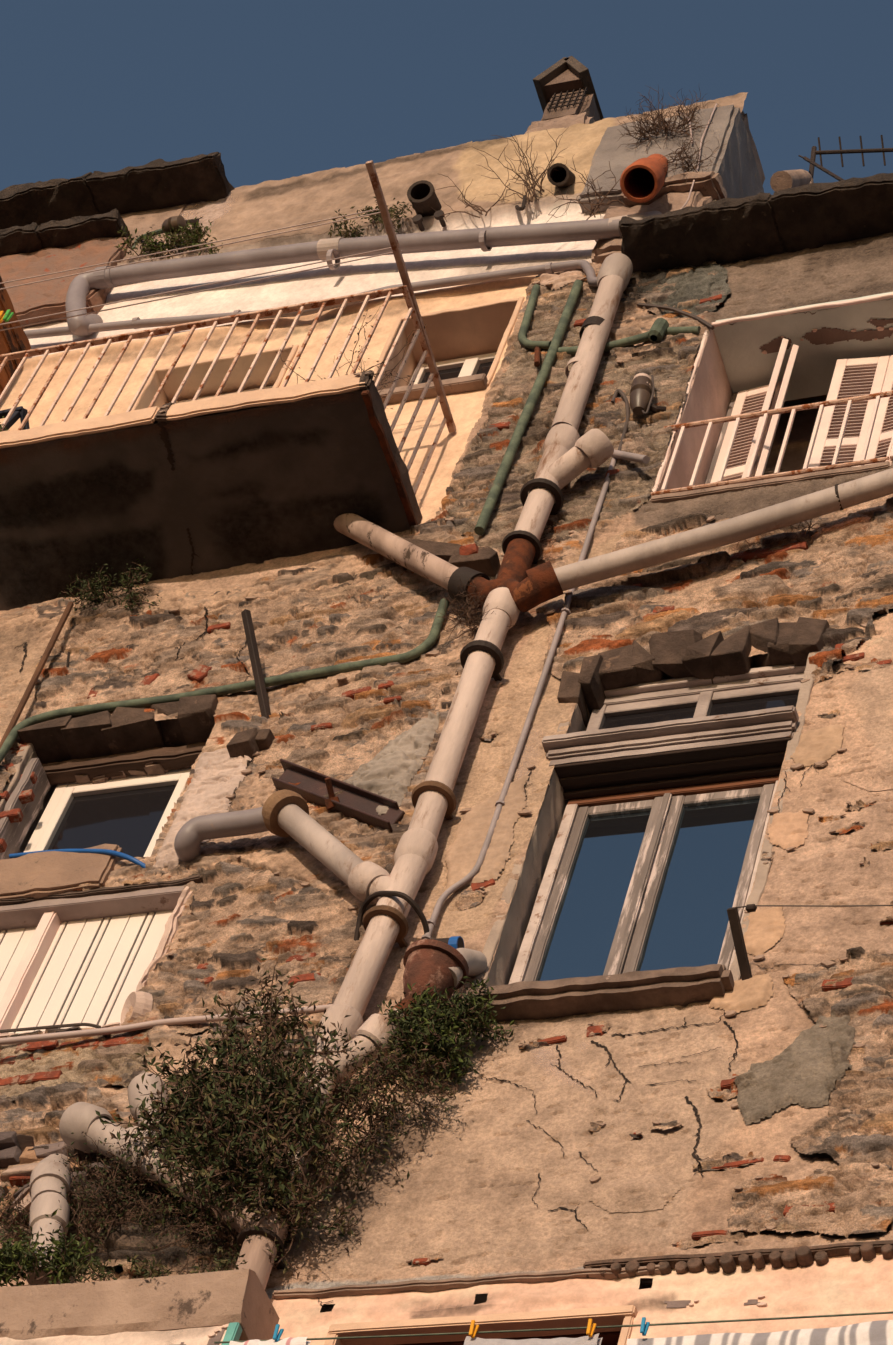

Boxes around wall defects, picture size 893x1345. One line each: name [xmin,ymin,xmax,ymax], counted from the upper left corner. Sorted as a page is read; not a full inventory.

peeling [759,319,893,354]
flaking render [34,569,465,798]
flaking render [542,494,893,685]
crack [475,1013,739,1229]
flaking render [669,946,893,1250]
peeling [207,1324,229,1345]